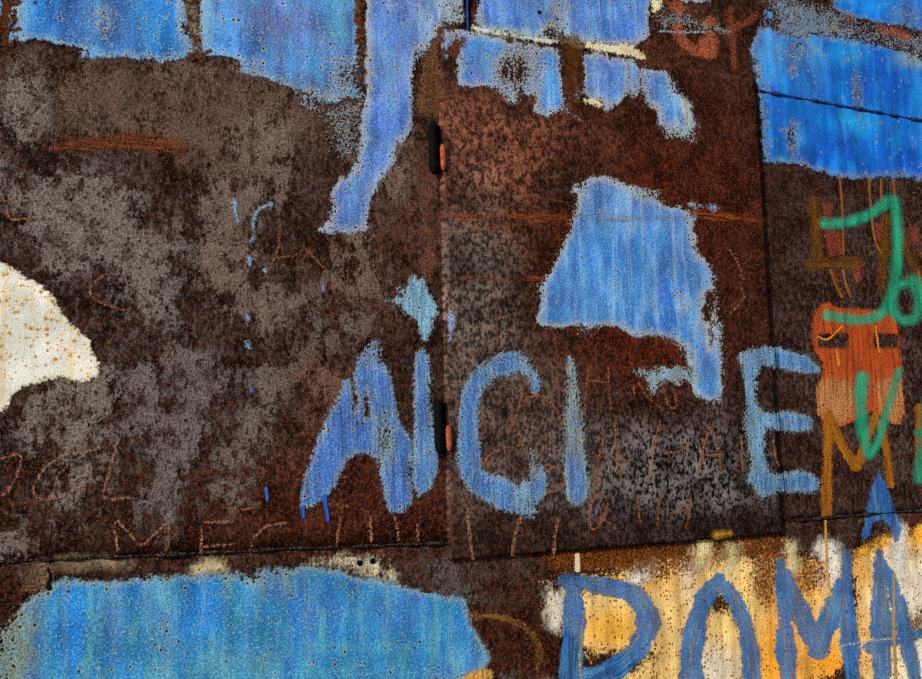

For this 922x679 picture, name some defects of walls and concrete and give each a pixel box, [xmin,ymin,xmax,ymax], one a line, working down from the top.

rust [0,0,21,55]
rust [184,0,212,66]
peeling [441,29,456,58]
rust [449,36,467,60]
peeling [471,25,558,44]
peeling [584,40,646,60]
peeling [651,0,735,36]
peeling [757,0,922,55]
rust [417,34,439,119]
rust [50,132,189,154]
rust [24,317,80,366]
rust [20,561,54,594]